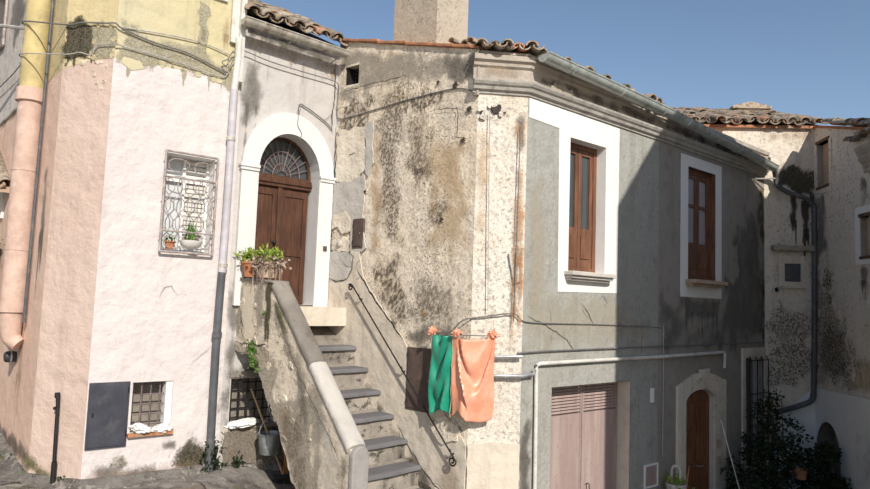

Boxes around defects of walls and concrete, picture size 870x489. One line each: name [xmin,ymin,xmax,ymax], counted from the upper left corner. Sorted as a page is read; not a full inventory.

damp [11,0,24,46]
damp [61,15,114,66]
spalling [340,80,443,242]
damp [35,202,45,287]
damp [255,283,272,343]
spalling [373,253,452,328]
spalling [431,200,448,224]
corrosion [511,196,525,327]
damp [662,190,765,349]
damp [778,164,827,260]
spalling [221,285,315,489]